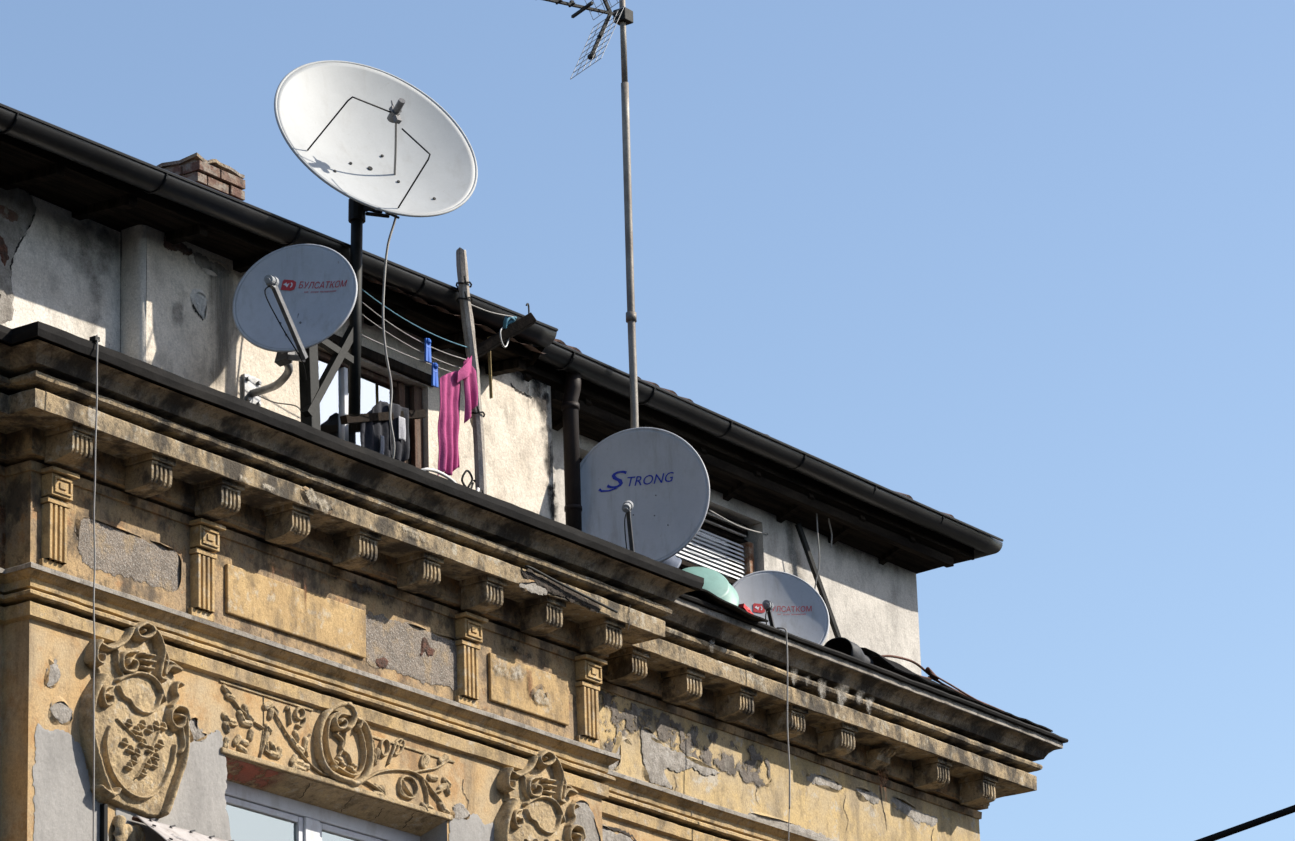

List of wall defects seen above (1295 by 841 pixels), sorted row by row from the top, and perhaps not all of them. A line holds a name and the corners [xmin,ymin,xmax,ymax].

flaking render [0,188,37,324]
flaking render [74,516,182,592]
flaking render [366,611,458,691]
peeling [44,658,73,725]
peeling [189,714,208,742]
peeling [598,685,772,793]